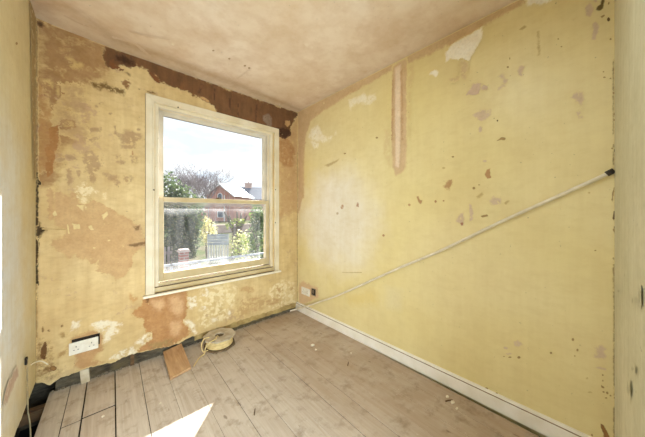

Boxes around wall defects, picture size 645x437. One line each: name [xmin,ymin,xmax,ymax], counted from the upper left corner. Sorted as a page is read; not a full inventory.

flaking render [407,0,525,65]
flaking render [30,1,146,281]
flaking render [279,61,399,223]
spalling [127,291,191,353]
peeling [195,278,320,331]